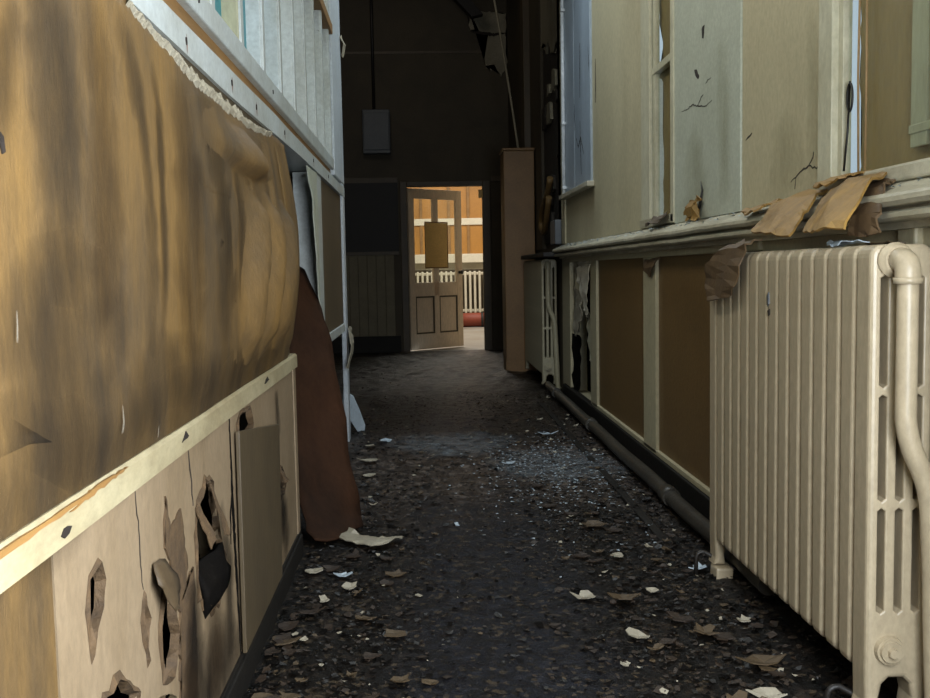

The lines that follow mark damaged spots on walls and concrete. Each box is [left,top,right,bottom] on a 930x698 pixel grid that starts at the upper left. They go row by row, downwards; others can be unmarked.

peeling [126,0,273,137]
peeling [195,484,230,549]
peeling [153,496,200,698]